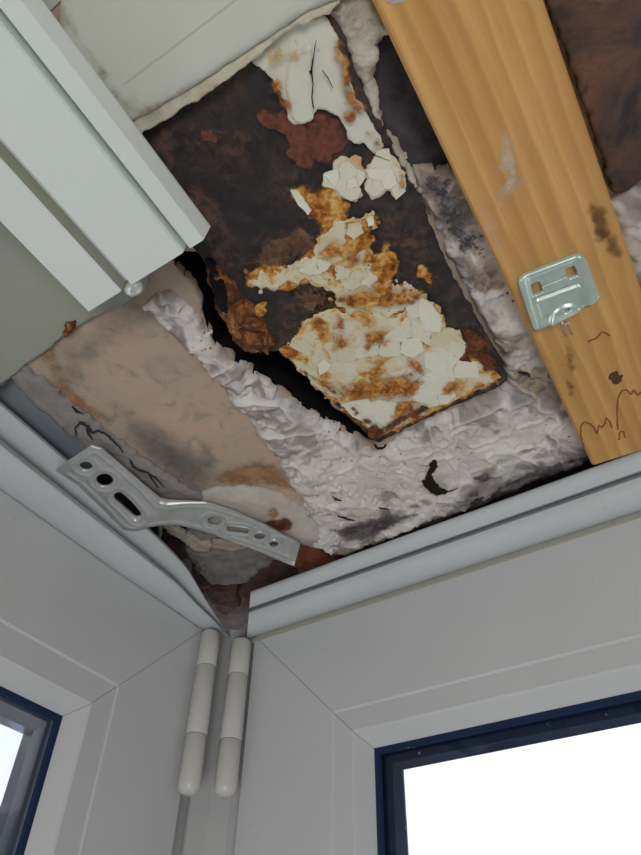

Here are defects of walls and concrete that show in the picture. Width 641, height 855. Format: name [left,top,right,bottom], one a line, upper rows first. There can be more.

corrosion [257,42,365,169]
crack [309,42,333,108]
corrosion [205,186,436,355]
peeling [248,0,501,434]
damp [423,176,484,255]
damp [592,206,618,253]
corrosion [304,330,500,440]
crack [71,406,164,488]